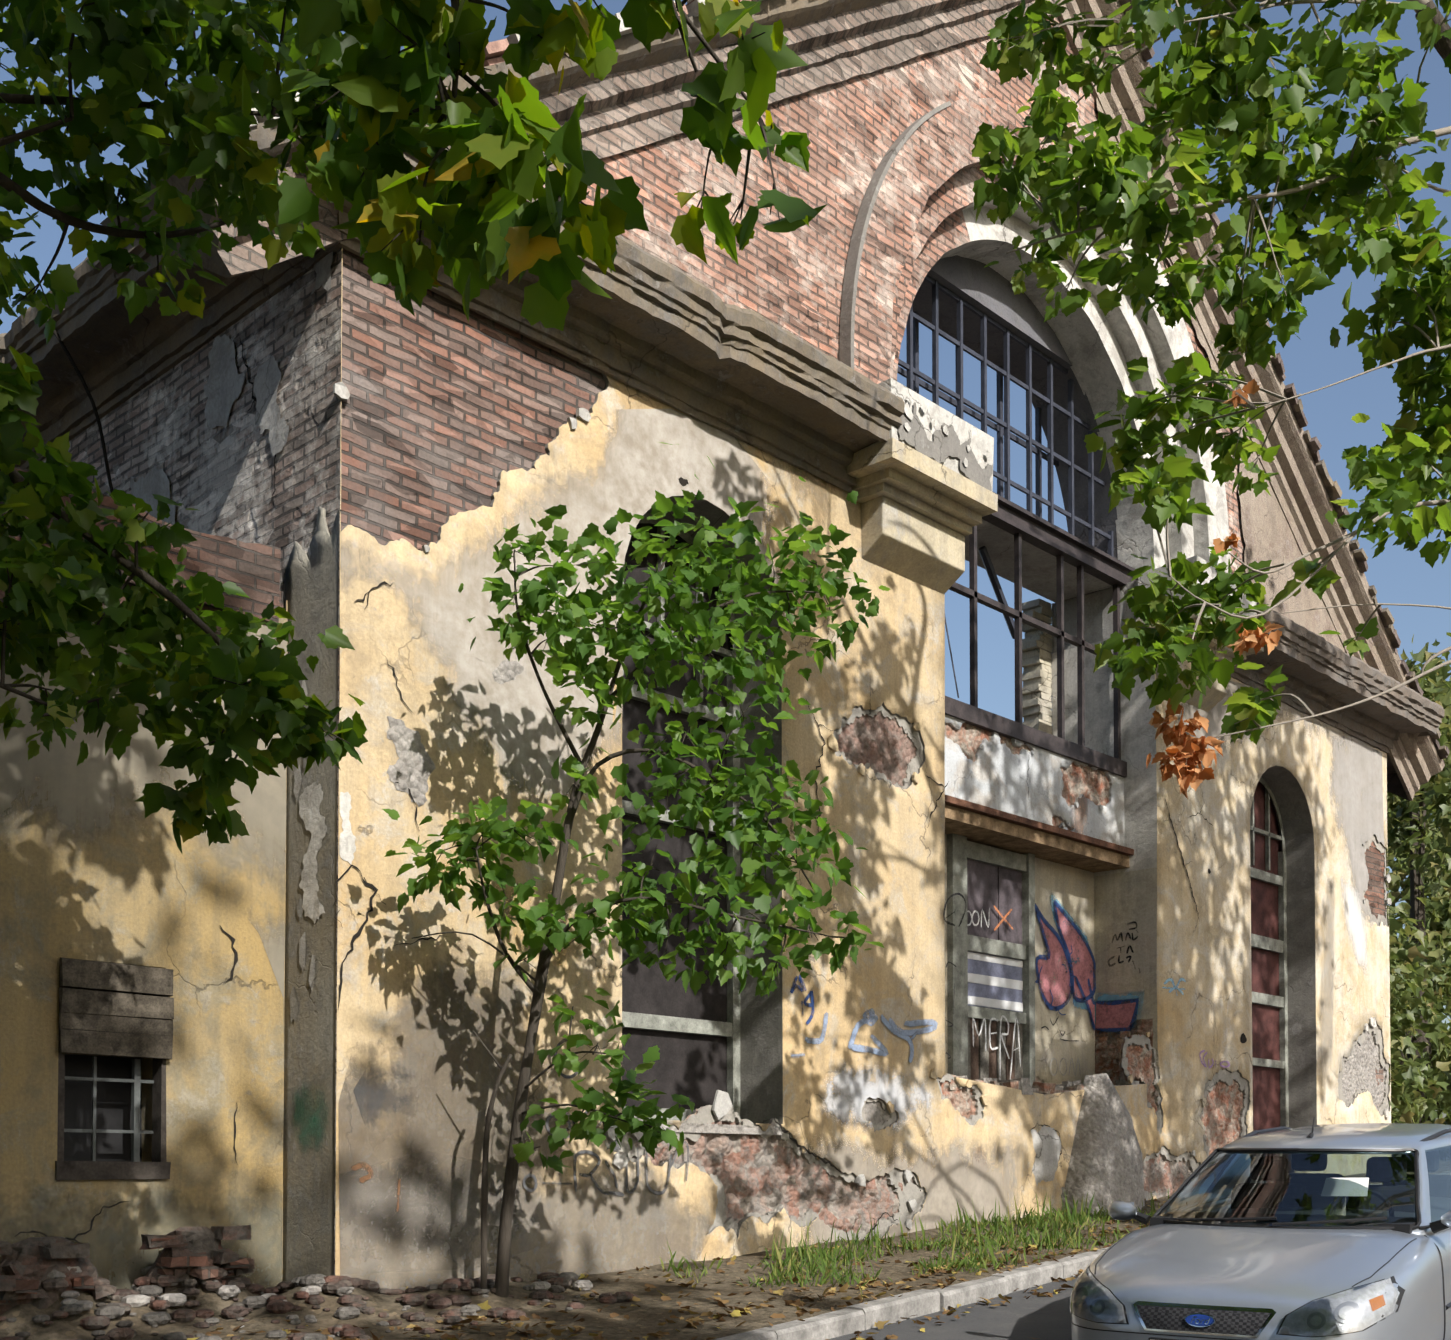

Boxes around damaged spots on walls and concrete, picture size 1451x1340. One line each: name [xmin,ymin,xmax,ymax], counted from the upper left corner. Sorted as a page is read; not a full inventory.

flaking render [333,248,779,800]
crack [220,925,238,984]
peeling [297,652,308,696]
peeling [290,757,356,1023]
crack [333,865,443,1008]
spalling [827,705,924,789]
spalling [945,723,1035,762]
spalling [1052,762,1110,831]
peeling [1331,736,1392,927]
spalling [603,1090,925,1240]
spalling [1119,1032,1249,1201]
spalling [1338,1017,1390,1120]